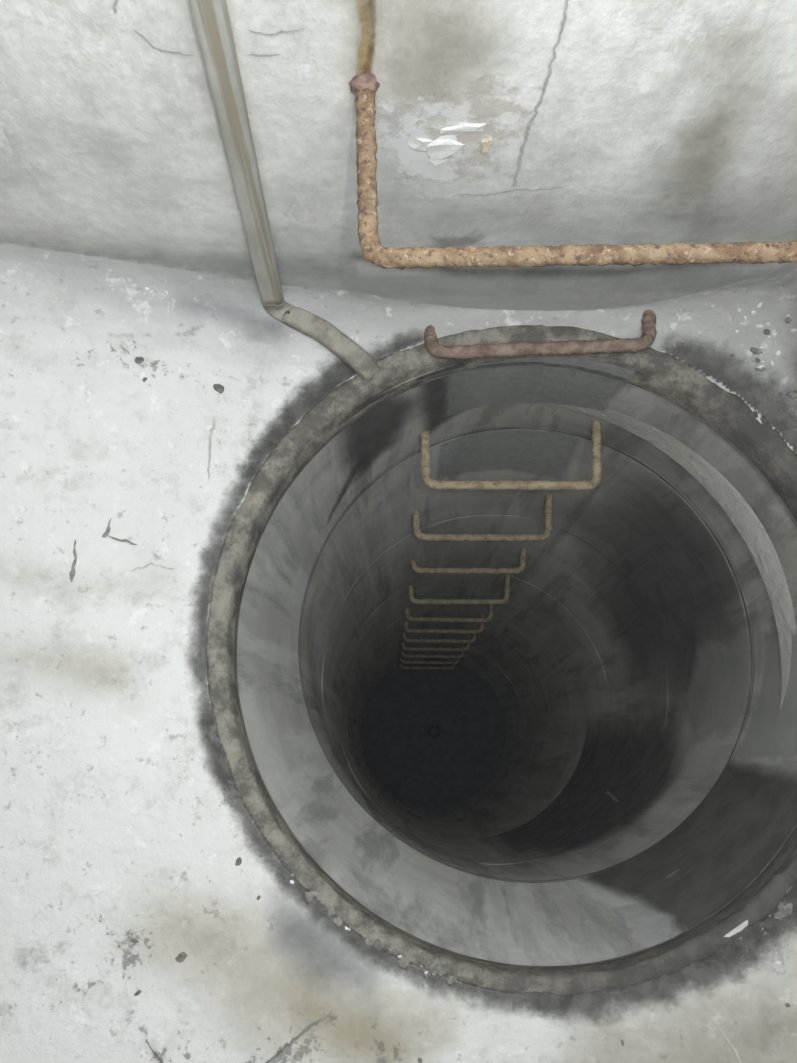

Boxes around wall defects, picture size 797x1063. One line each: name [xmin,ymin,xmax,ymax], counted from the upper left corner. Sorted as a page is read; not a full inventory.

corrosion [359,0,374,74]
leakage [370,335,424,361]
leakage [190,342,797,1020]
crack [265,1011,333,1063]